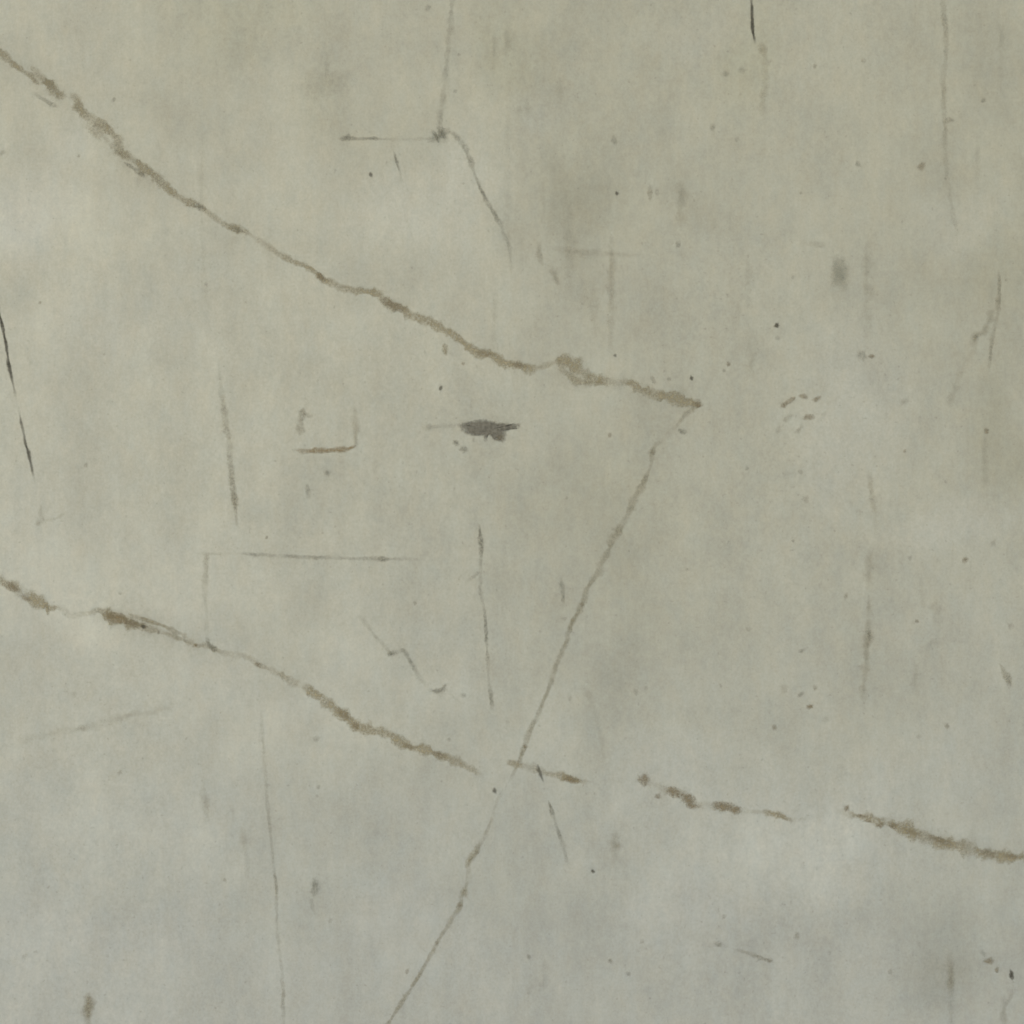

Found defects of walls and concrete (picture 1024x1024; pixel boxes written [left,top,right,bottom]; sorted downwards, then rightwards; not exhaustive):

crack [0,49,204,209]
crack [285,256,533,372]
crack [557,356,700,407]
crack [1,582,55,612]
crack [103,609,165,629]
crack [307,687,461,765]
crack [561,773,579,782]
crack [643,775,739,812]
crack [845,806,1023,862]